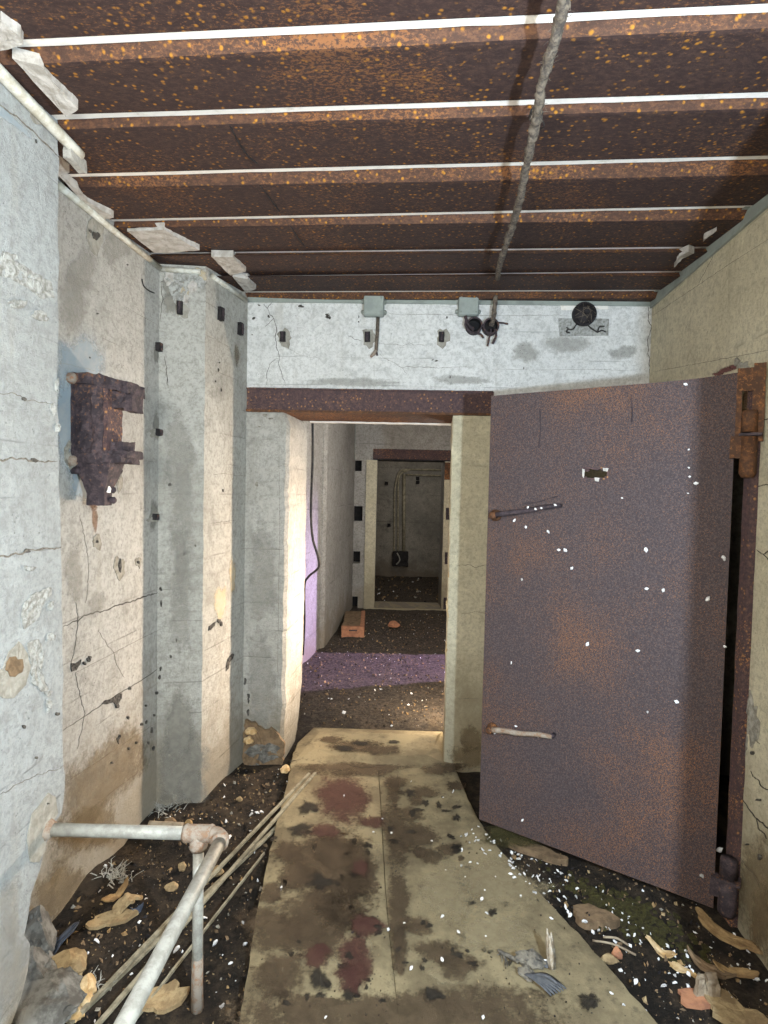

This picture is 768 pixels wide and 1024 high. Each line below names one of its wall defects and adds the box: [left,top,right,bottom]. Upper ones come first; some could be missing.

crack [265,304,293,385]
spalling [0,587,60,716]
crack [0,519,158,794]
damp [220,736,570,1024]